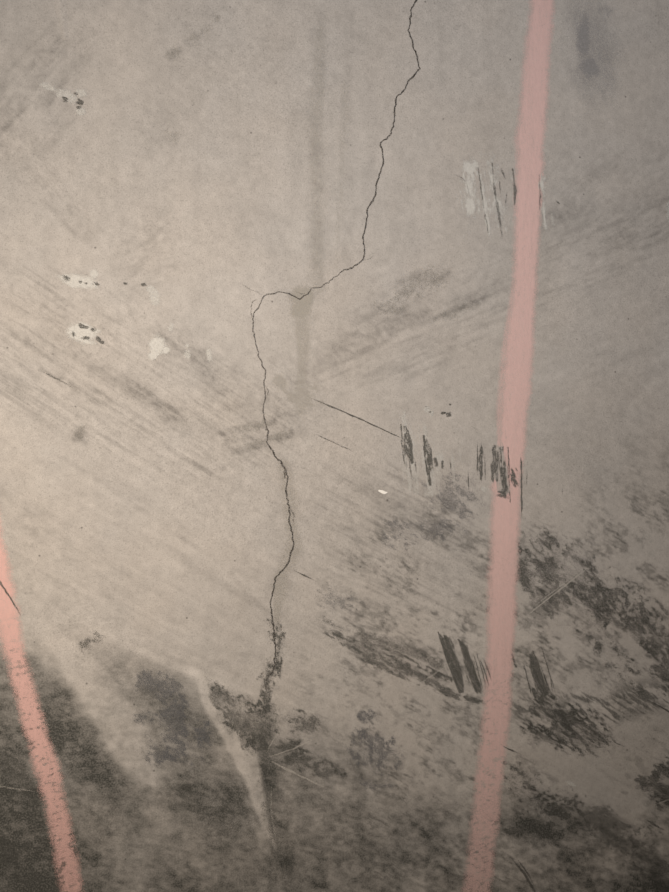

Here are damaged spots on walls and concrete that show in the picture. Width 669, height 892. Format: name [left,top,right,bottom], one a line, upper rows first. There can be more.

crack [245,0,421,694]